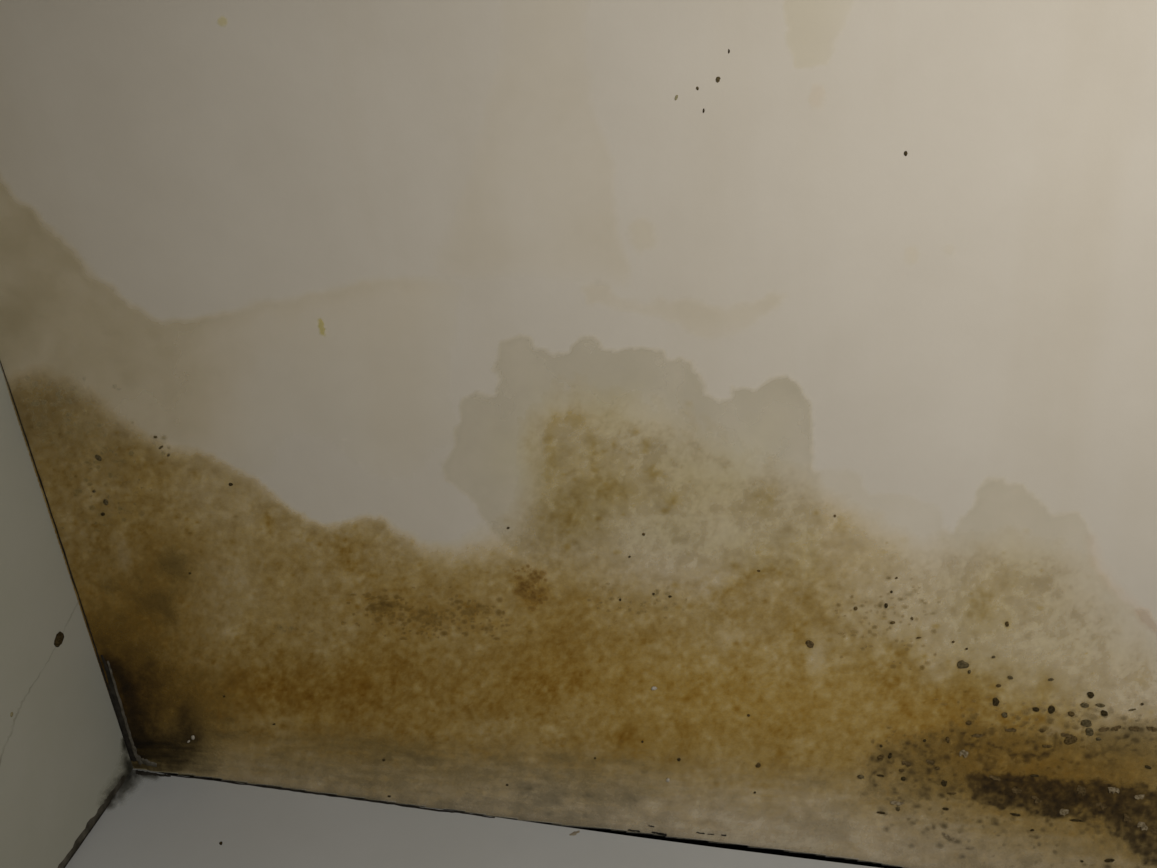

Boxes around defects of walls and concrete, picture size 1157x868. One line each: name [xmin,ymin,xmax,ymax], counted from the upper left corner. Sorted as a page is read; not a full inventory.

water stain [0,209,79,371]
water stain [84,548,247,776]
water stain [341,565,548,640]
water stain [835,577,940,670]
water stain [270,738,660,827]
water stain [857,676,1157,868]